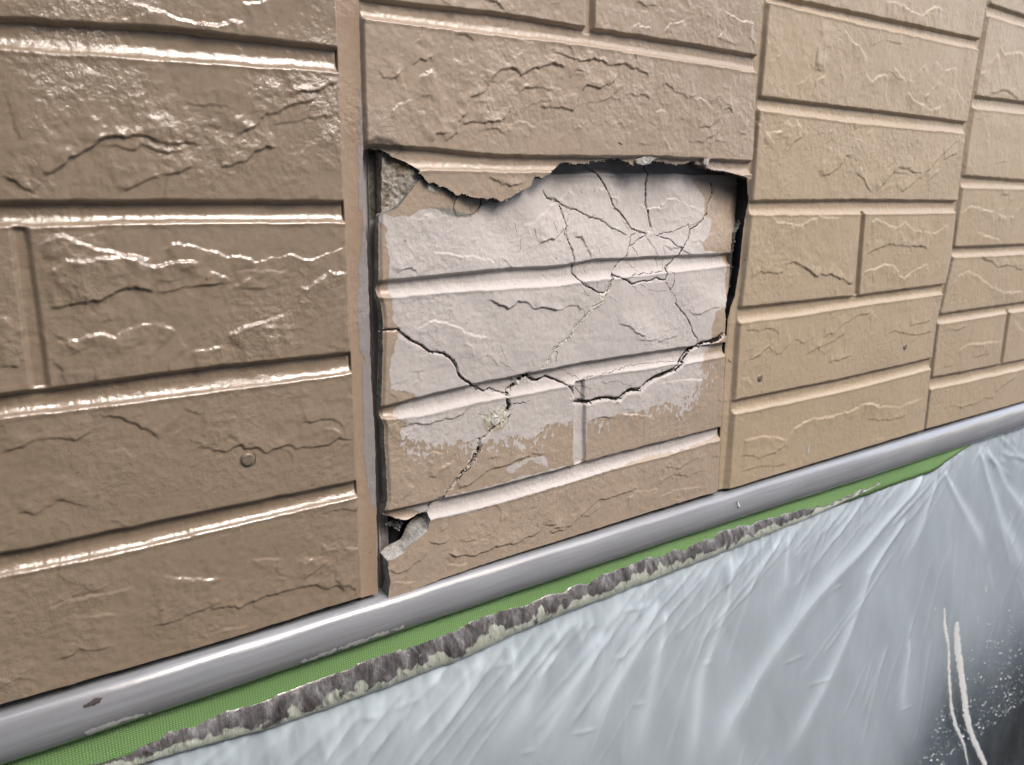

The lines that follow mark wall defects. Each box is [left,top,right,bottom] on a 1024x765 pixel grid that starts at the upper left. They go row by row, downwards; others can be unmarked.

peeling [376,151,727,561]
crack [377,164,731,513]